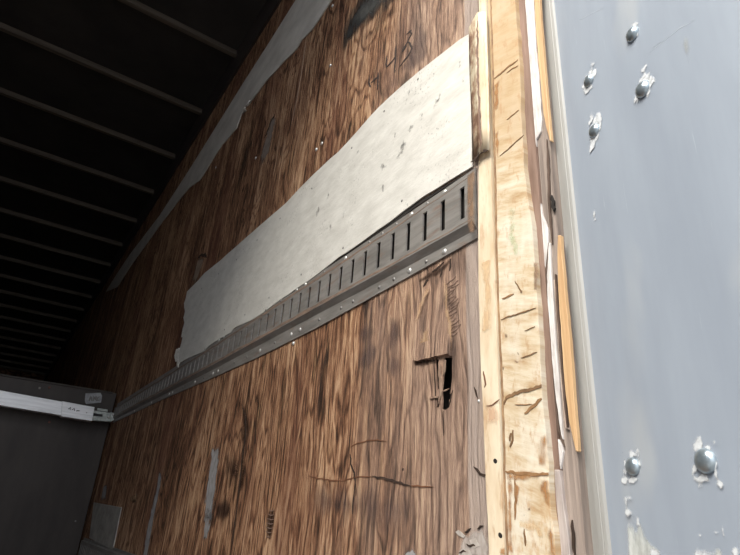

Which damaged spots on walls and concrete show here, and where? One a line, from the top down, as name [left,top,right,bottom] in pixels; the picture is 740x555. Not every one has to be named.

peeling [639,64,655,97]
peeling [588,113,602,152]
peeling [693,436,715,451]
crack [310,439,432,514]
peeling [621,450,641,484]
peeling [692,462,723,488]